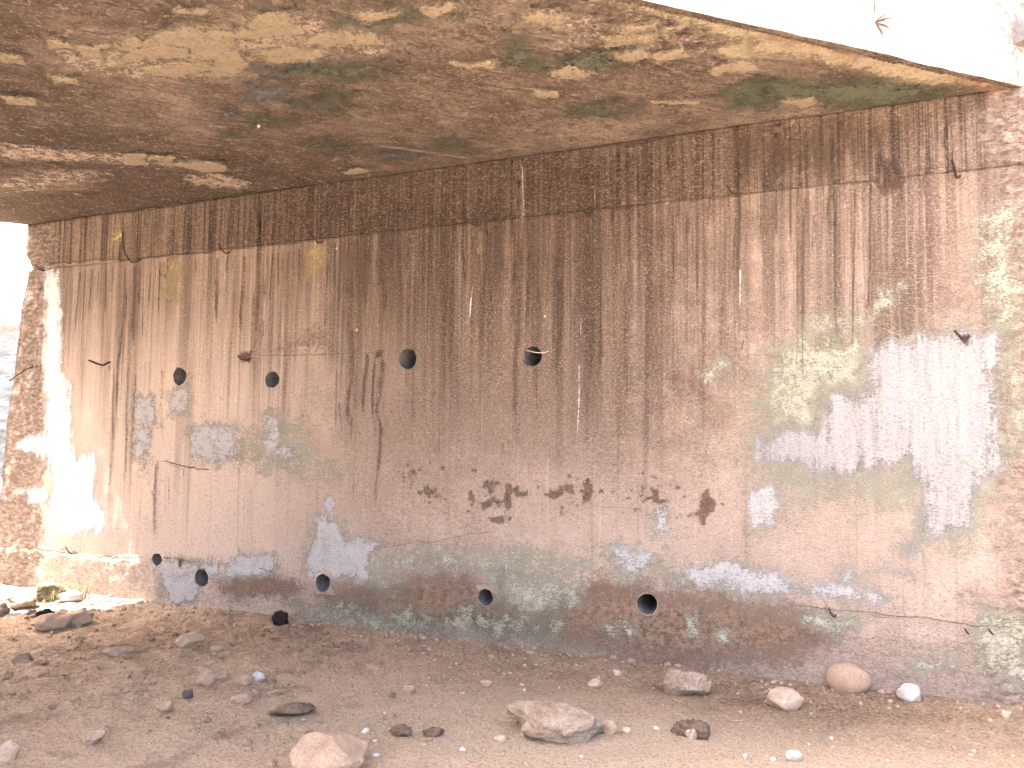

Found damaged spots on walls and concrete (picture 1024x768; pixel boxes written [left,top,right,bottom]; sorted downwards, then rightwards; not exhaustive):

damp [215,203,401,324]
damp [735,112,905,378]
damp [63,260,185,465]
peeling [130,375,243,469]
peeling [260,411,295,462]
damp [335,331,384,469]
peeling [300,513,385,587]
damp [467,474,614,524]
damp [626,472,685,511]
damp [676,489,724,527]
damp [319,570,842,672]
crack [778,605,1024,629]